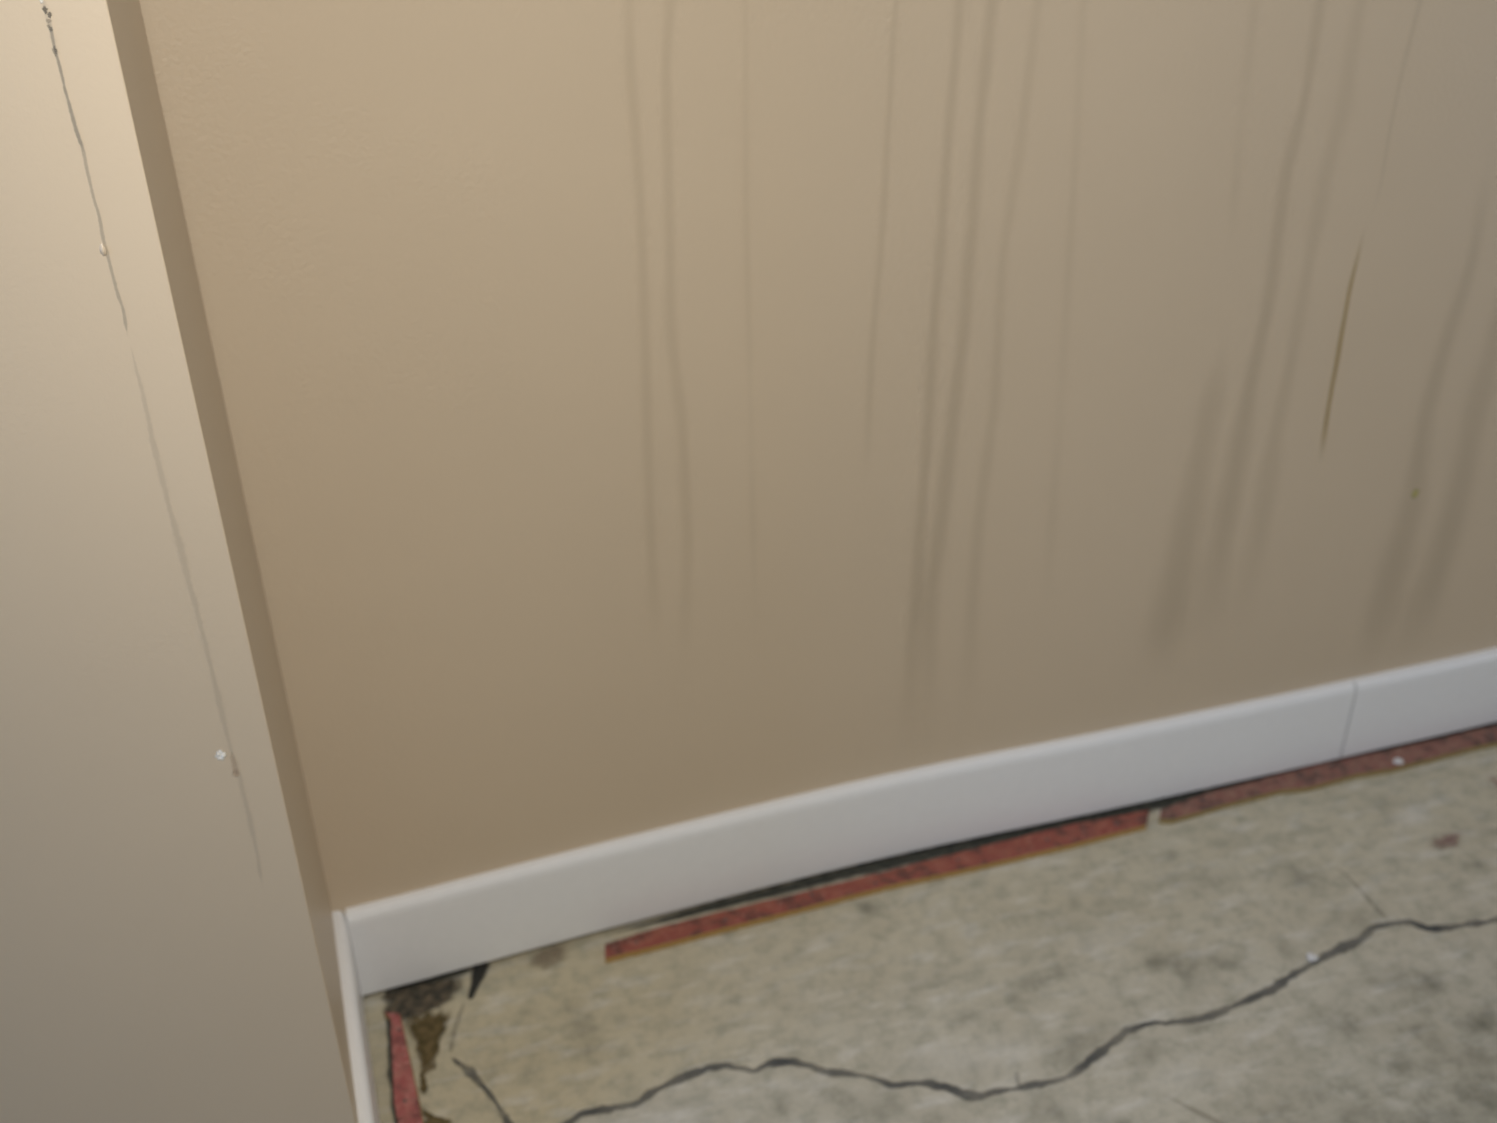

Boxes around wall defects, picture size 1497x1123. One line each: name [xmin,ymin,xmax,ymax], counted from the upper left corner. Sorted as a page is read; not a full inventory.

spalling [407,1011,451,1123]
crack [468,962,490,1000]
crack [452,1058,512,1123]
crack [565,920,1488,1123]